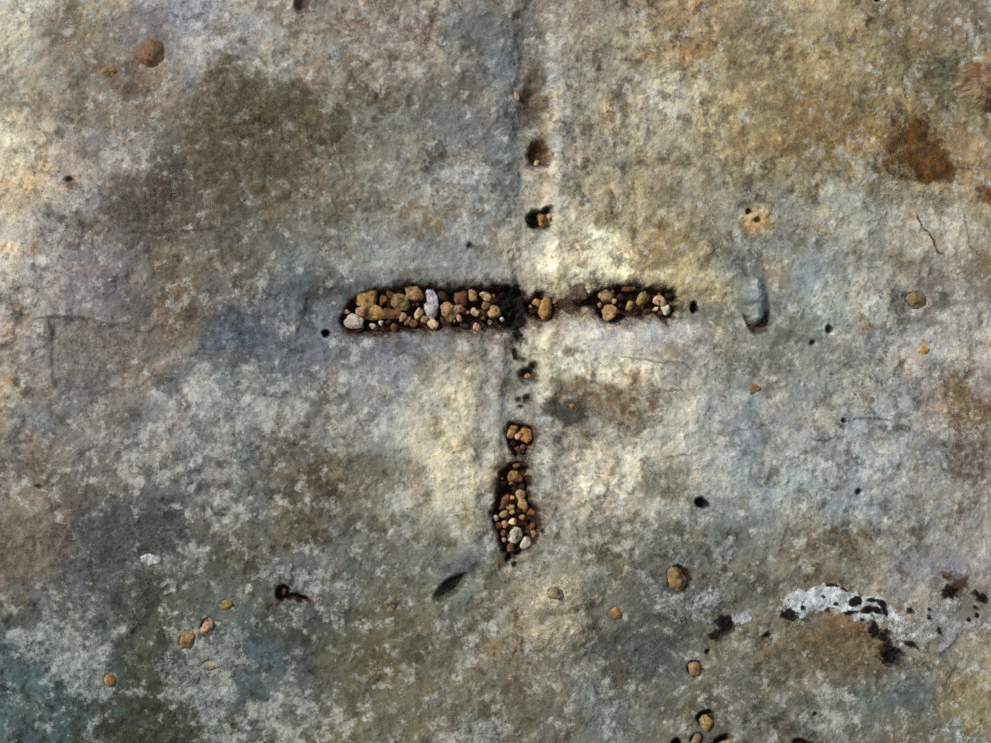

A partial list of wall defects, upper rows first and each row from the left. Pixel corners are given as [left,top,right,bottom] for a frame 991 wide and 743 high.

corrosion [873,116,965,185]
spalling [322,280,698,383]
spalling [489,421,544,567]
peeling [640,466,689,498]
efflorescence [780,583,991,652]